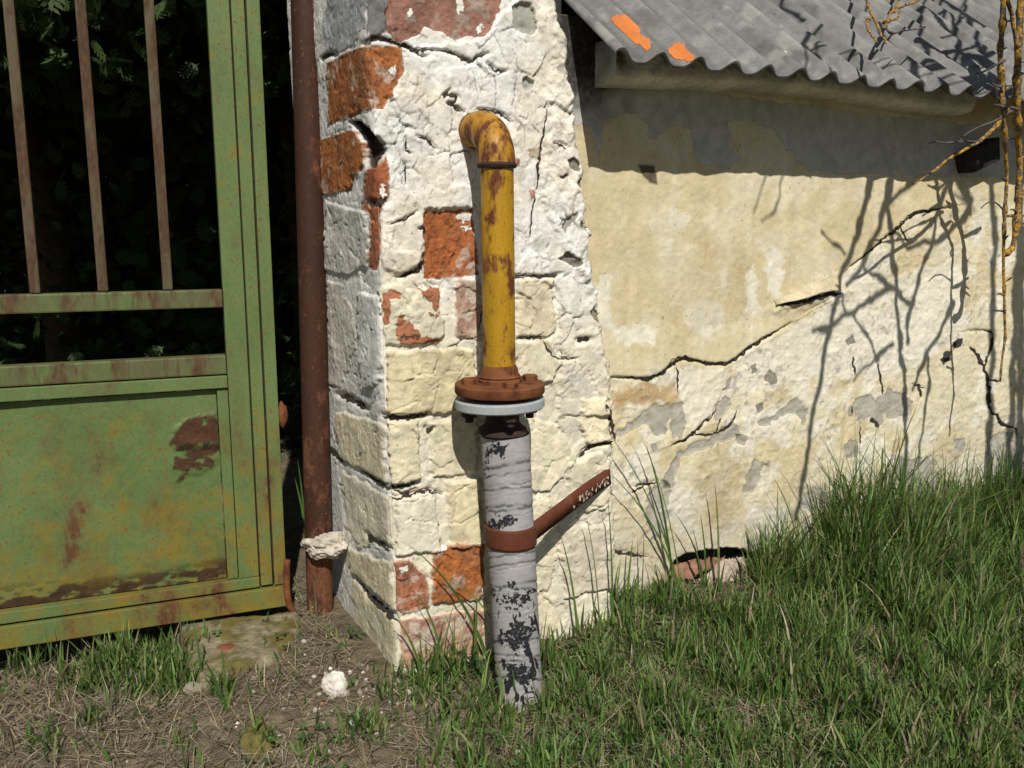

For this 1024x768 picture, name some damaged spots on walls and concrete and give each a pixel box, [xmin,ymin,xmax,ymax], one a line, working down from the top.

spalling [320,0,537,270]
rust [170,415,219,480]
spalling [382,289,440,345]
spalling [418,208,481,339]
peeling [616,377,748,544]
crack [612,291,843,391]
peeling [755,398,808,426]
peeling [848,387,913,428]
crack [970,329,1018,436]
rust [0,560,227,609]
spalling [372,543,485,654]
spalling [670,556,752,590]